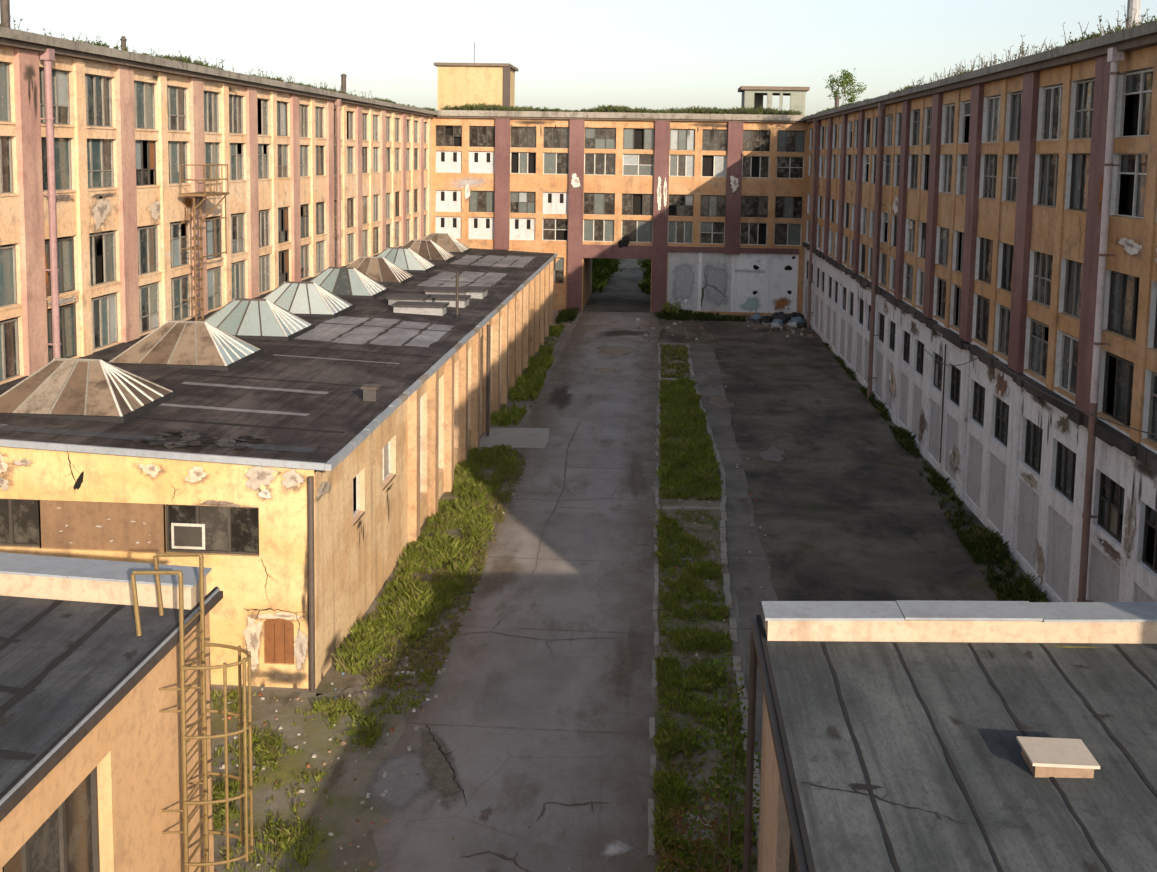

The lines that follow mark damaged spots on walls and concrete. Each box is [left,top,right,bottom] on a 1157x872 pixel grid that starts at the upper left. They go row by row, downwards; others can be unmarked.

peeling [657,176,667,214]
peeling [730,174,739,196]
peeling [91,193,112,236]
peeling [1116,237,1157,263]
peeling [0,454,30,490]
peeling [185,466,209,483]
peeling [244,466,305,499]
crack [244,559,309,640]
crack [425,724,468,807]
crack [537,801,614,820]
crack [809,782,965,824]
crack [463,848,529,872]